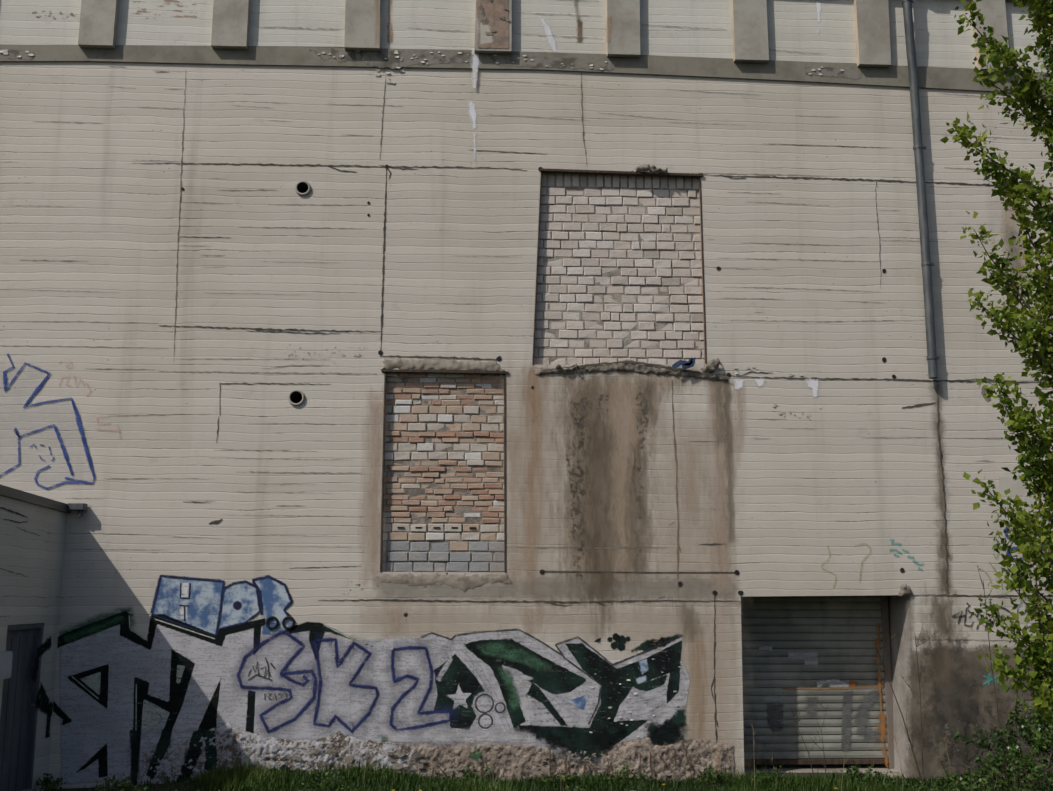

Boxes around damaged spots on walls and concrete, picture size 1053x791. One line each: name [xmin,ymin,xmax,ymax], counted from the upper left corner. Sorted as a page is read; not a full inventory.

peeling [0,49,34,61]
spalling [310,0,510,84]
damp [468,102,477,167]
damp [471,48,479,88]
crack [0,66,542,569]
crack [702,167,1053,322]
damp [561,372,683,599]
crack [318,360,1053,742]